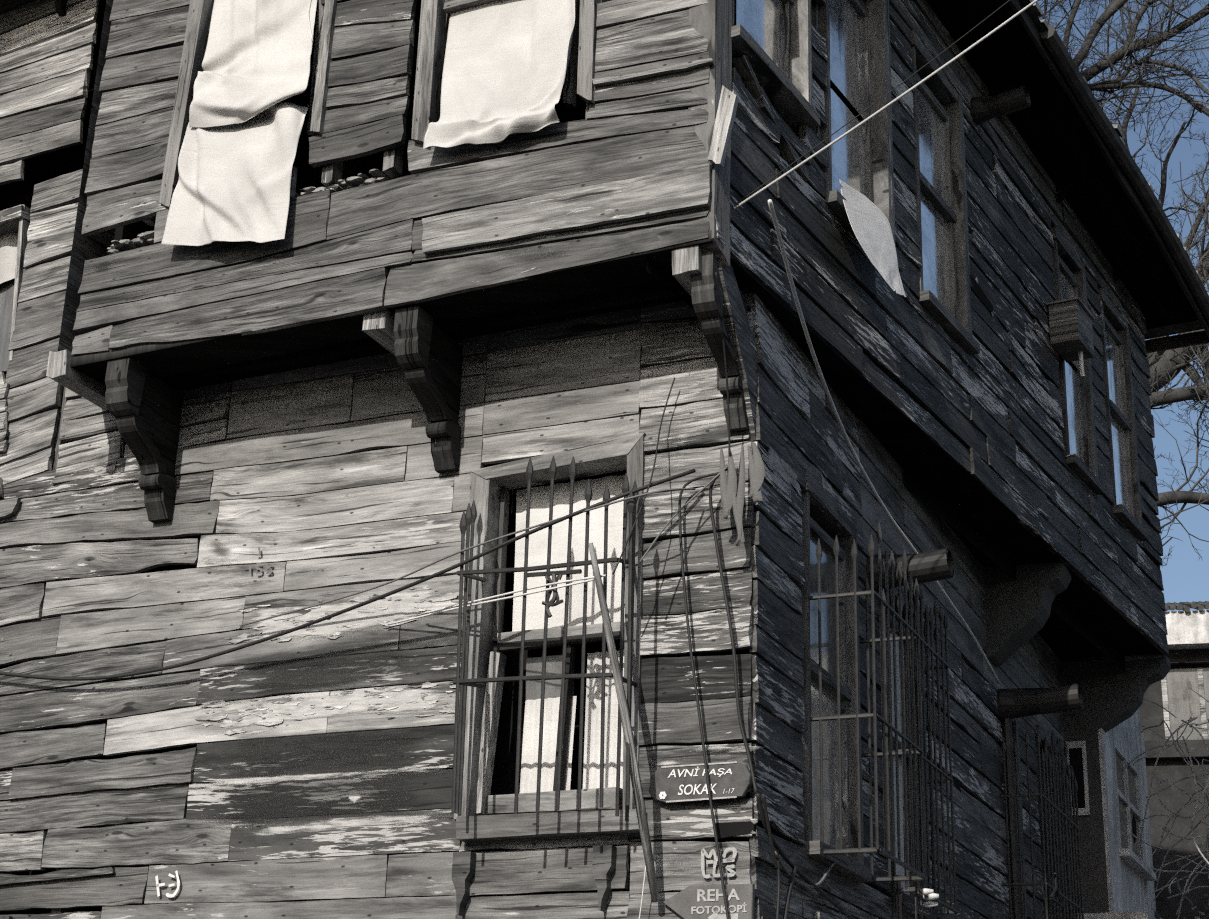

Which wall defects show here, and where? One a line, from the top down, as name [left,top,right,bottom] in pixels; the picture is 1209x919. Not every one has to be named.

peeling [759,446,801,495]
peeling [194,682,456,735]
spalling [715,818,758,840]